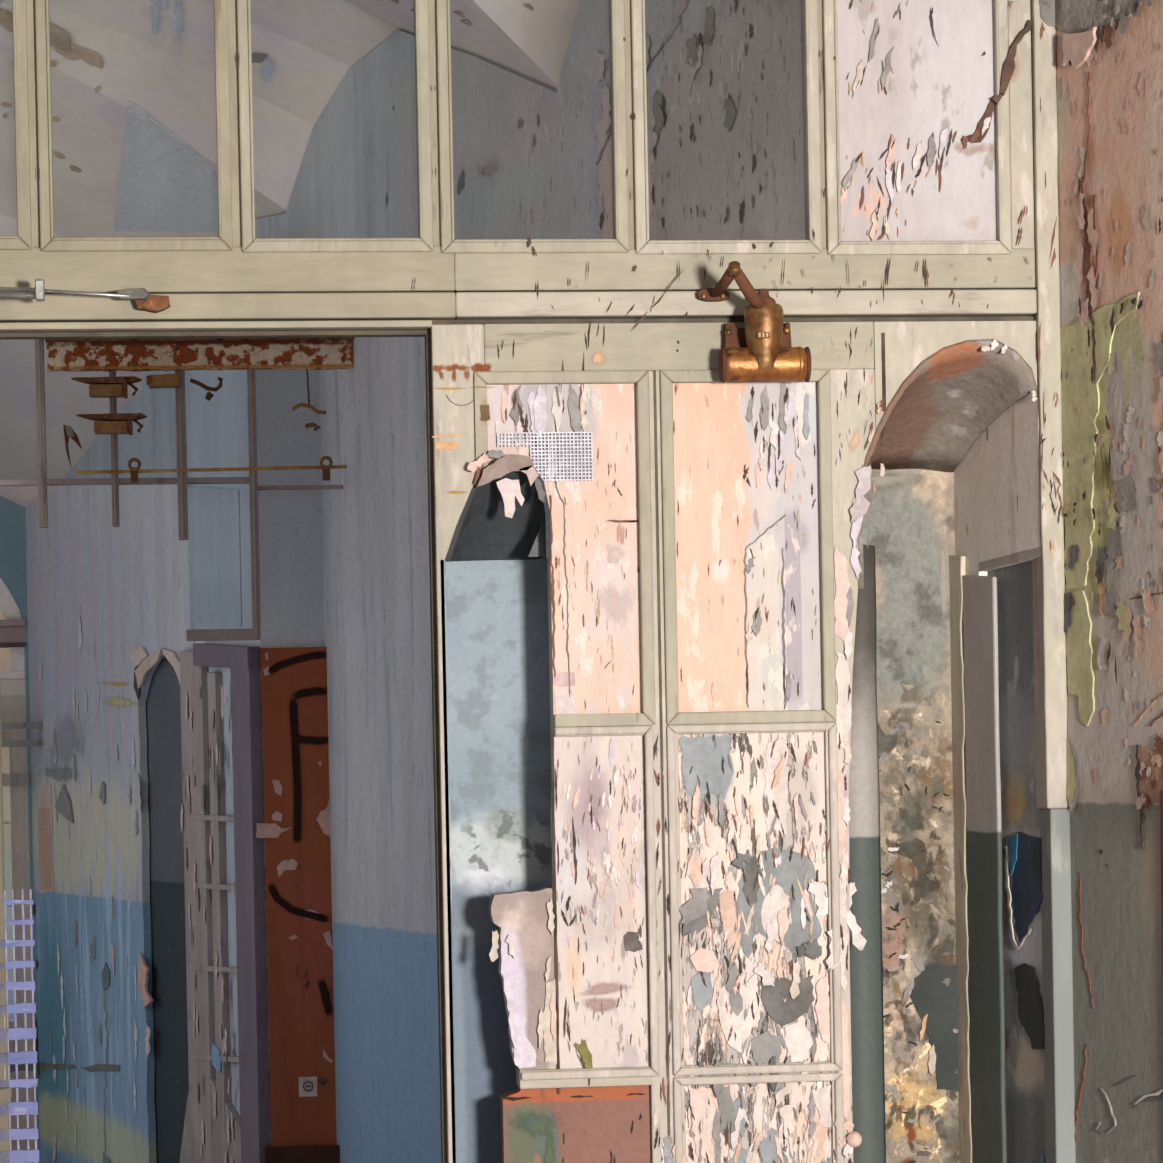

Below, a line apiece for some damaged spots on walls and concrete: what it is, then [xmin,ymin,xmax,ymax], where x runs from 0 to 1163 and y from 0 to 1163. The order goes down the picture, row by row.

spalling [583,582,629,668]
spalling [553,664,586,714]
peeling [631,328,885,1163]
peeling [489,930,517,962]
peeling [502,740,644,1098]